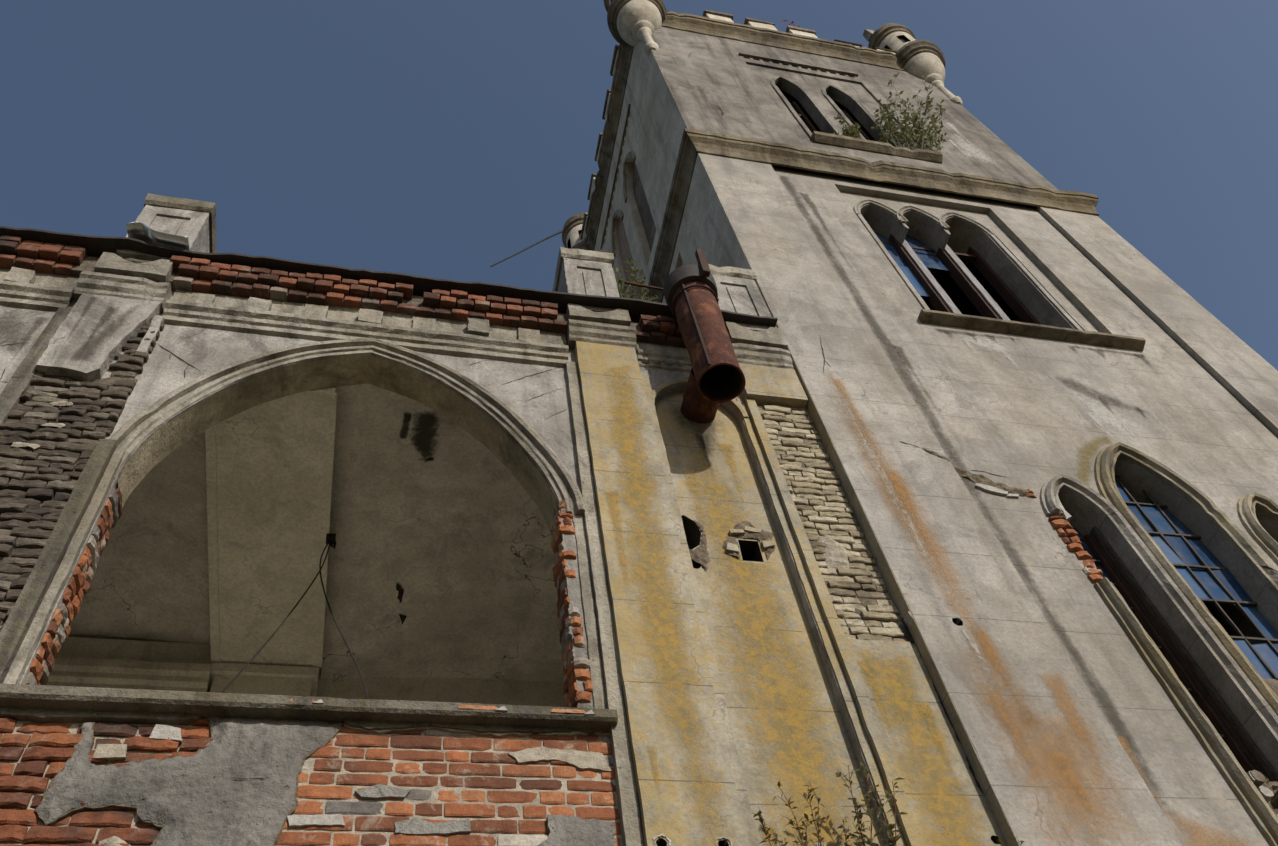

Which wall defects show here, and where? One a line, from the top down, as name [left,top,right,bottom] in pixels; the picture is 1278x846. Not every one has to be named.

spalling [22,487,123,685]
spalling [0,321,164,632]
spalling [396,584,407,625]
spalling [551,500,595,715]
spalling [681,515,776,570]
spalling [757,404,915,643]
spalling [900,441,1037,498]
spalling [1048,497,1103,583]
spalling [458,704,508,712]
spalling [0,718,214,846]
spalling [276,726,621,846]
spalling [1246,770,1278,818]